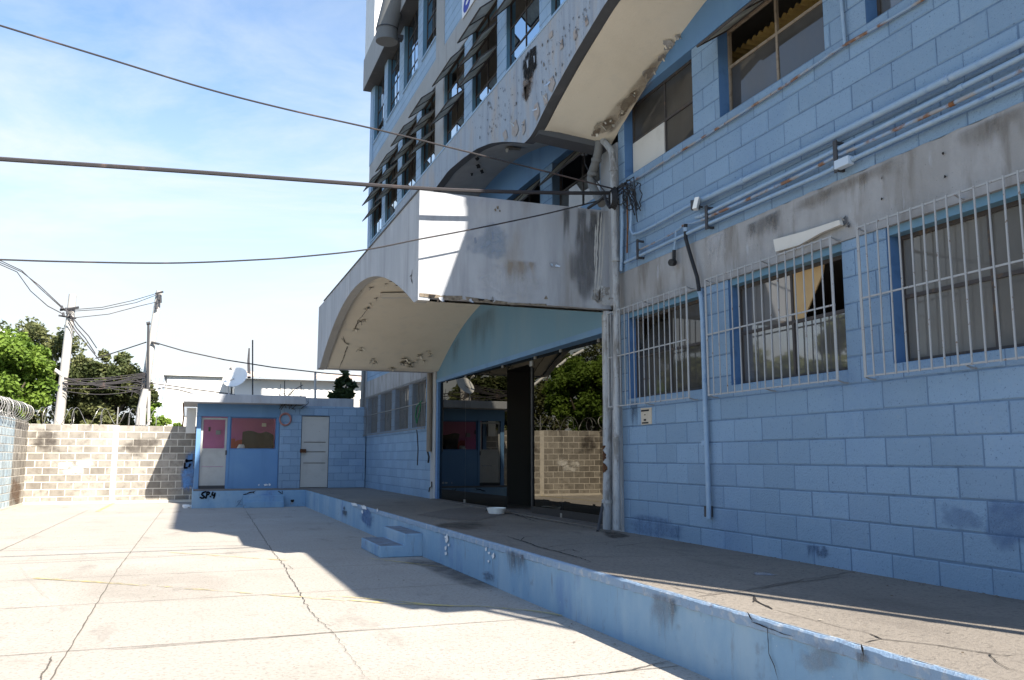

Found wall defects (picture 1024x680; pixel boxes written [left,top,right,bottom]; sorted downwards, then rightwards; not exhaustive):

peeling [479,1,590,152]
peeling [592,91,636,137]
water stain [564,209,605,296]
crack [109,491,371,676]
crack [675,575,1024,678]